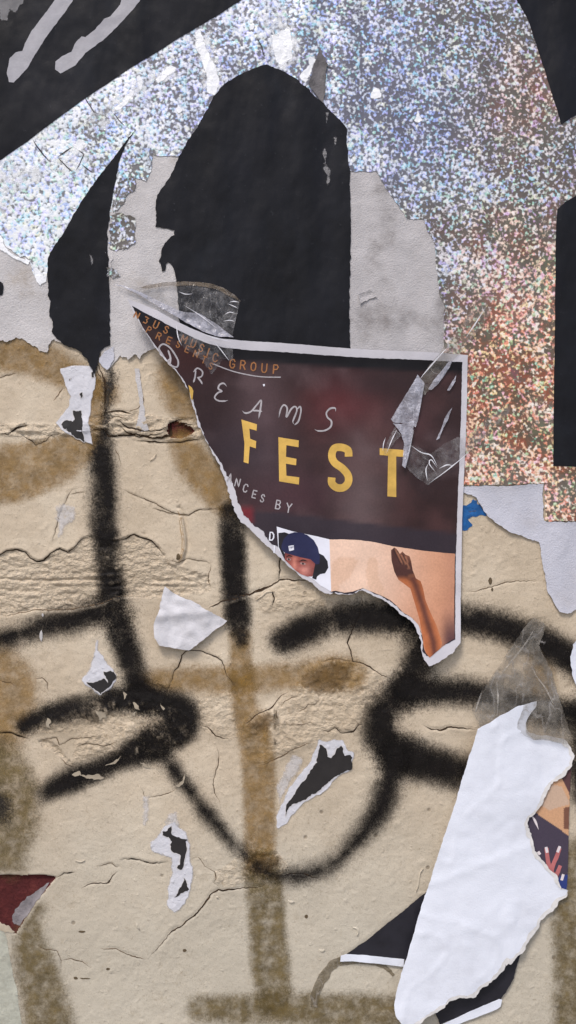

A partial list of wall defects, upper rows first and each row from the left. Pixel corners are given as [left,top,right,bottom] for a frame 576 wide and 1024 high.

spalling [0,422,73,444]
spalling [88,410,205,440]
crack [0,488,82,562]
crack [322,597,389,678]
crack [162,650,235,690]
crack [56,858,163,887]
crack [109,857,316,959]